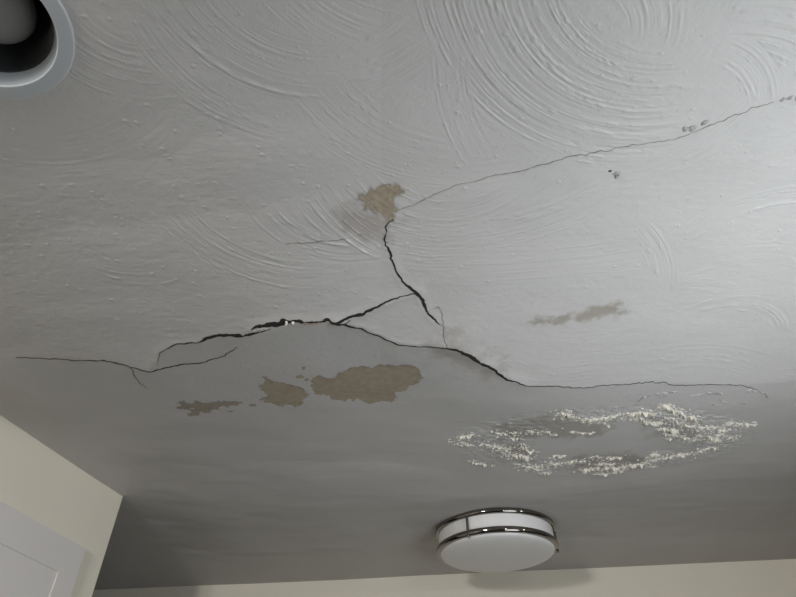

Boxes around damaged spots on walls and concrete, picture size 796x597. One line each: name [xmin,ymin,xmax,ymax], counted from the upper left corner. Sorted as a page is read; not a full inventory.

leakage [359,184,404,221]
crack [16,102,773,390]
peeling [178,364,423,416]